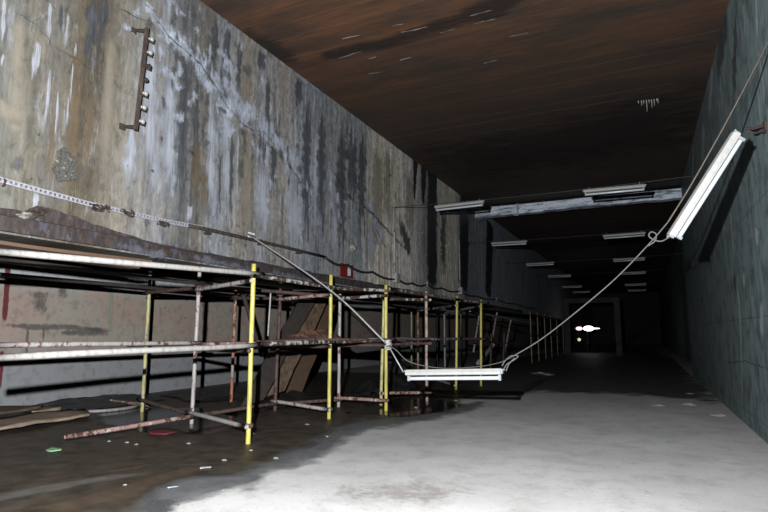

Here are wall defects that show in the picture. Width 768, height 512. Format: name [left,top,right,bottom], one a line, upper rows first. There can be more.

water stain [1,0,23,119]
water stain [32,4,69,73]
water stain [45,65,73,131]
spalling [52,148,77,182]
water stain [74,0,115,151]
crack [121,5,313,208]
water stain [119,0,390,261]
crack [335,175,409,256]
water stain [324,0,519,59]
water stain [400,160,446,286]